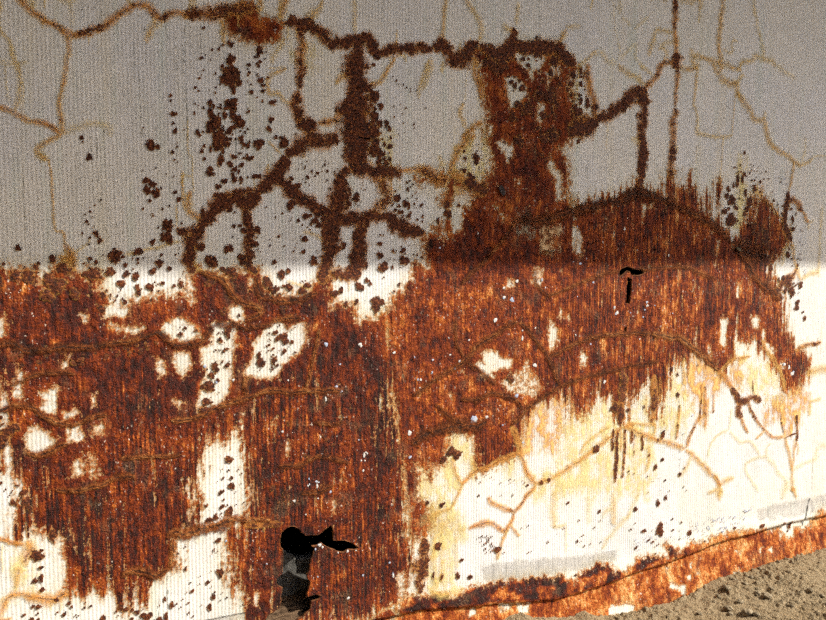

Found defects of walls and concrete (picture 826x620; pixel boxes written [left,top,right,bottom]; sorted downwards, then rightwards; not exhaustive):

rust [413,169,470,211]
crack [0,0,821,458]
rust [733,160,792,289]
rust [219,328,265,405]
rust [730,355,746,386]
crack [411,319,818,559]
rust [605,425,627,483]
rust [628,418,655,466]
rust [671,405,695,439]
crack [302,481,333,497]
crack [0,537,68,620]
crack [121,514,283,581]